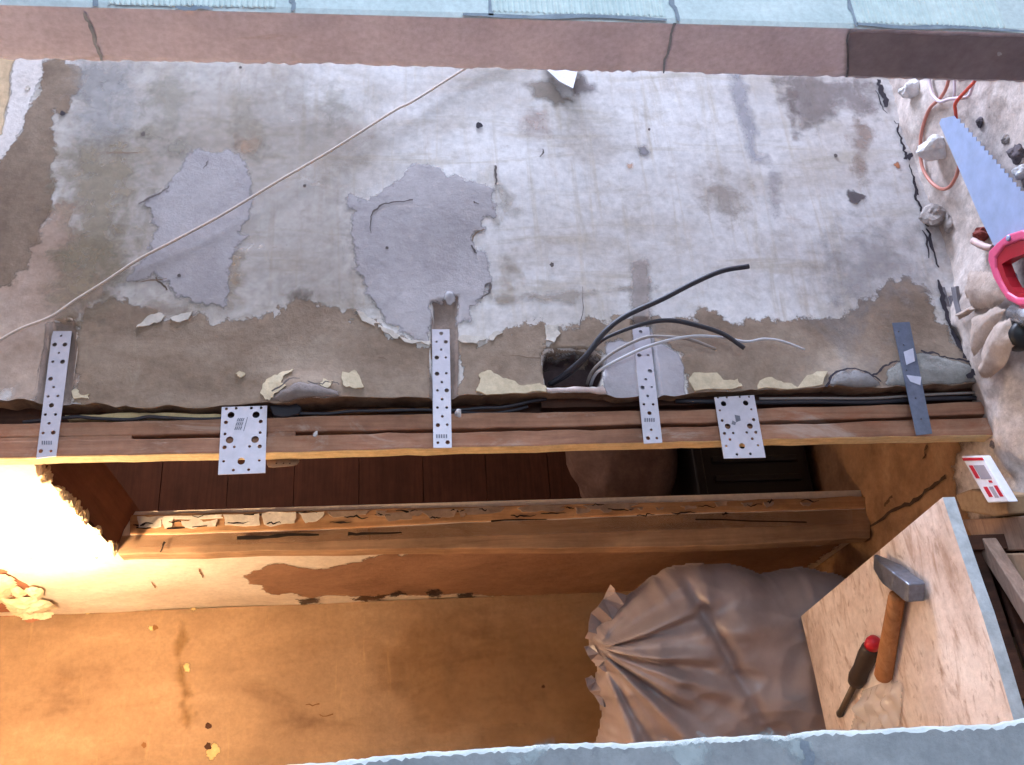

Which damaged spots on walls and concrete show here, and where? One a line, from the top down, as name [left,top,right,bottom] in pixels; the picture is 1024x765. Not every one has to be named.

leakage [528,75,594,105]
leakage [782,32,1024,127]
flaking render [0,58,83,287]
crack [875,79,971,367]
flaking render [71,148,969,408]
peeling [137,503,664,529]
crack [870,475,946,527]